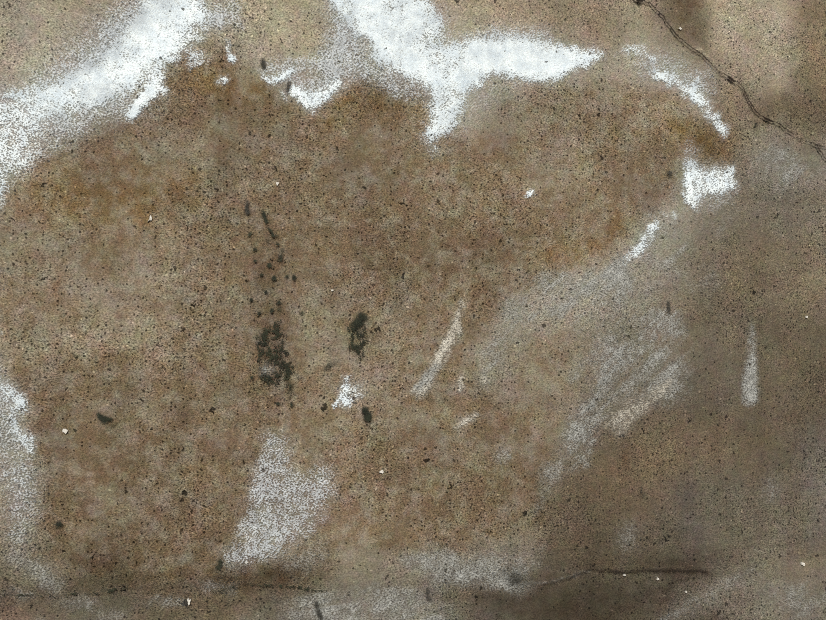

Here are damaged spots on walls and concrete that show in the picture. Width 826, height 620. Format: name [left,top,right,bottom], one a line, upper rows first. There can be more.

damp [260,0,603,149]
damp [624,45,728,135]
crack [637,0,826,159]
damp [682,159,737,208]
damp [259,211,296,281]
damp [548,220,659,318]
damp [0,384,34,453]
damp [250,300,299,407]
damp [333,378,359,409]
damp [347,312,369,360]
damp [568,301,683,448]
damp [215,439,330,570]